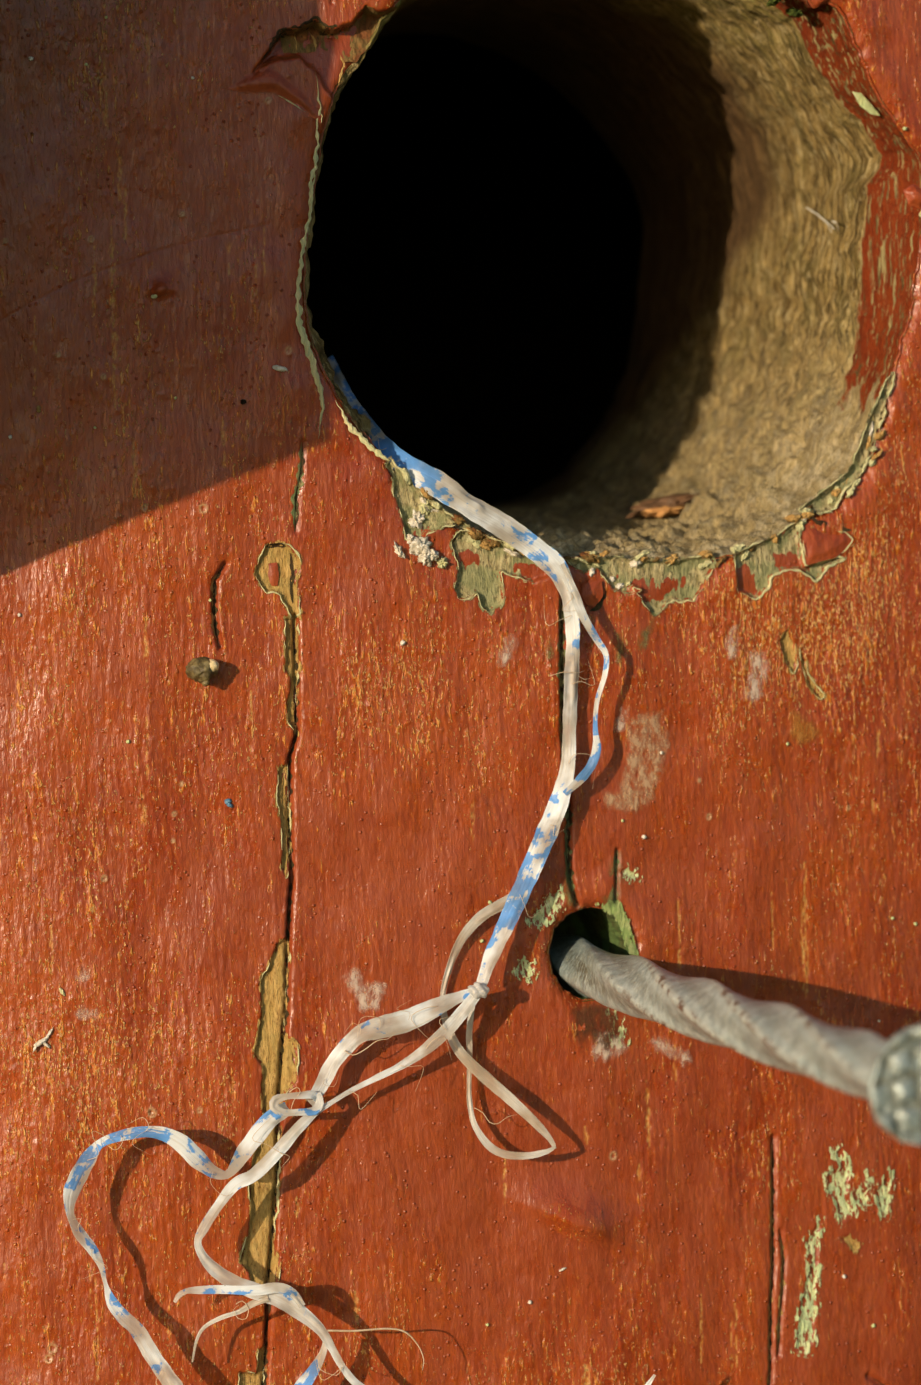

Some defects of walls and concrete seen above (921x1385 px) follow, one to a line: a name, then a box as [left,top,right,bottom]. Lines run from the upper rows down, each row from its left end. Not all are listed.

spalling [262,5,397,84]
peeling [853,92,880,116]
peeling [733,371,895,600]
crack [210,564,225,646]
peeling [565,555,716,616]
peeling [615,863,643,885]
peeling [525,884,566,931]
peeling [595,900,639,956]
peeling [511,956,540,984]
crack [261,626,300,1385]
peeling [790,1143,896,1358]